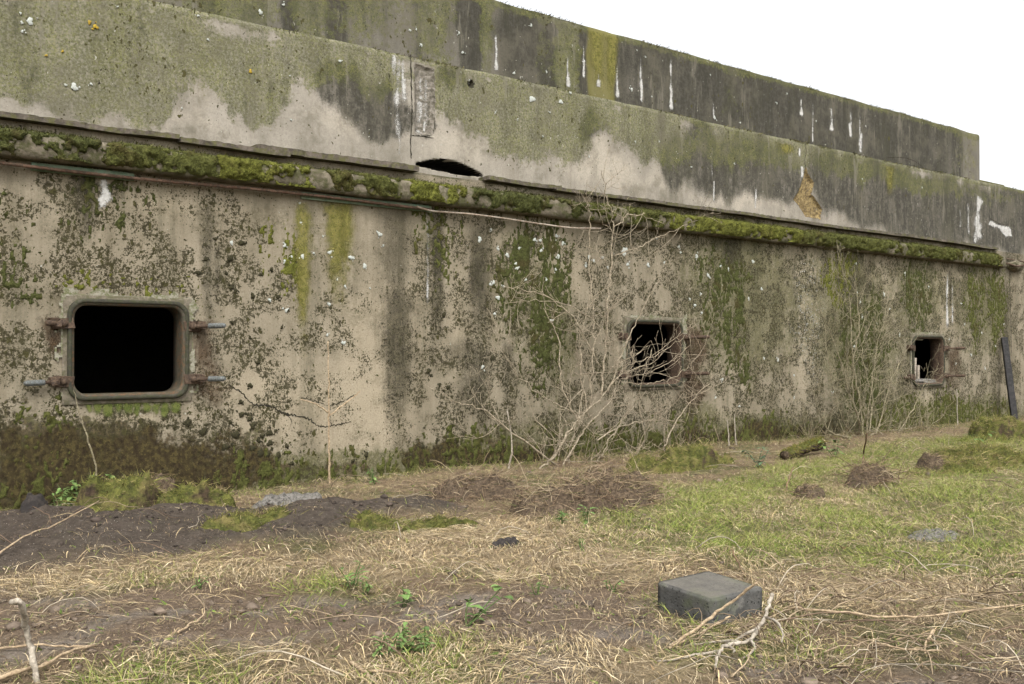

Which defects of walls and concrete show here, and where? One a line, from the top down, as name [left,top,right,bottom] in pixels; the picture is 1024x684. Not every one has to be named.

efflorescence [391,55,427,132]
hole [416,159,483,177]
damp [781,144,804,177]
spalling [793,169,822,219]
rust [45,325,60,351]
crack [229,385,354,428]